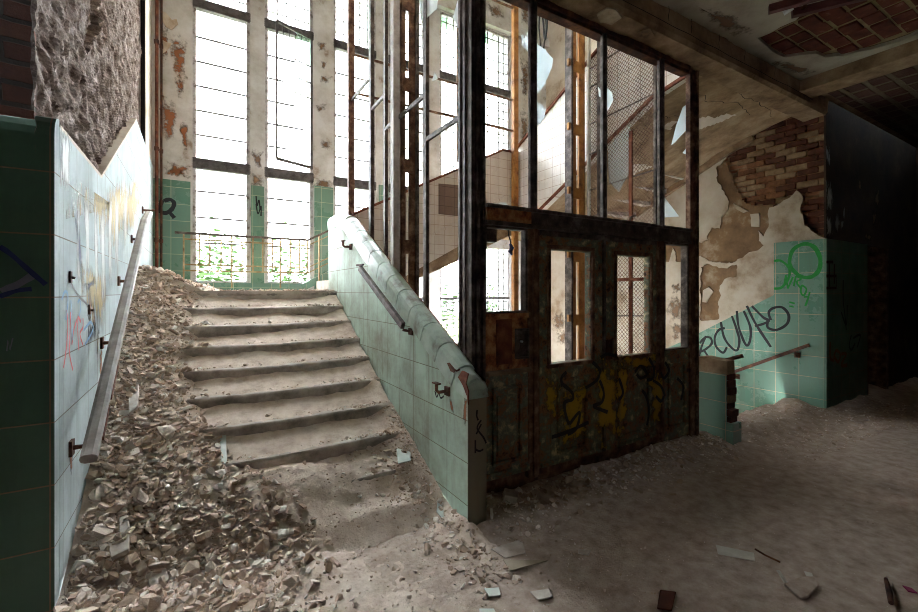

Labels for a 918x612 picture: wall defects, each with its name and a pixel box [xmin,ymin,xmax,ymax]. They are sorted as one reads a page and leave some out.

flaking render [30,0,142,169]
flaking render [666,245,681,262]
flaking render [699,117,845,321]
spalling [458,371,469,405]